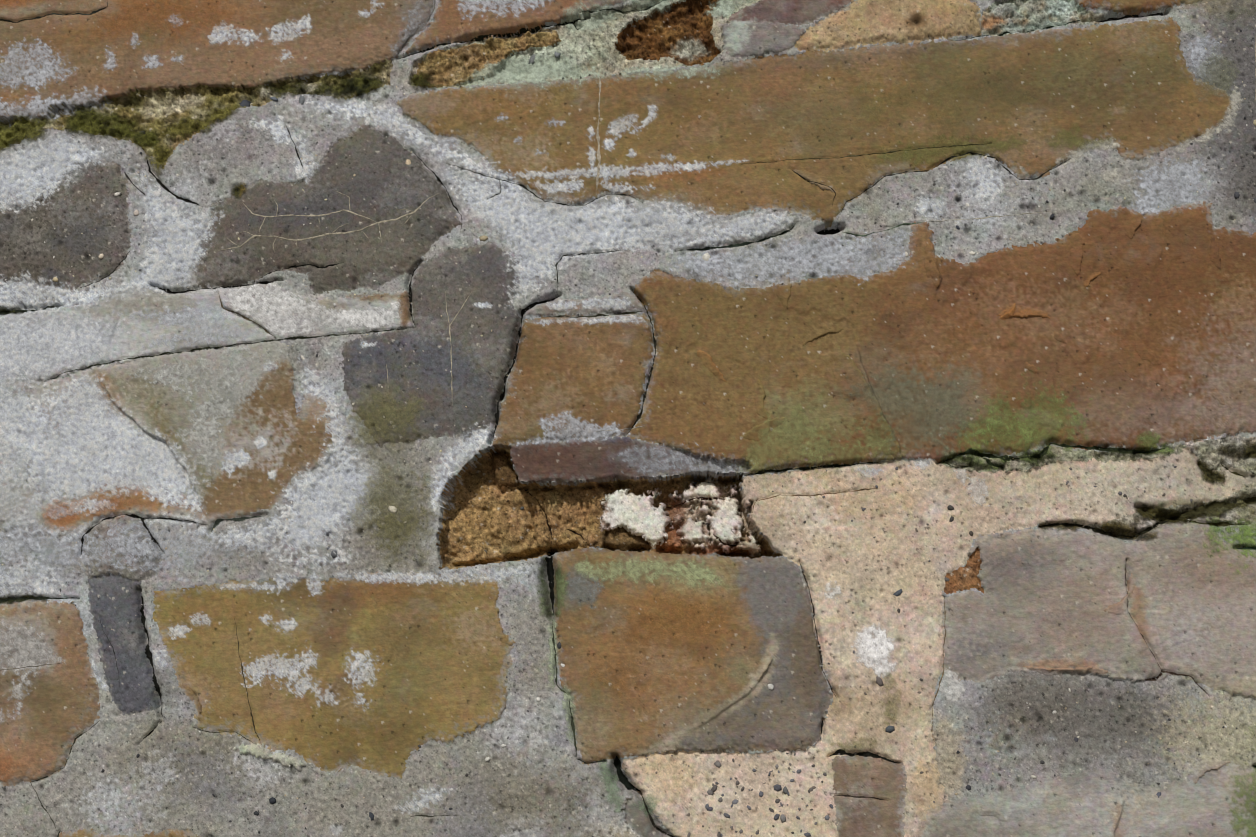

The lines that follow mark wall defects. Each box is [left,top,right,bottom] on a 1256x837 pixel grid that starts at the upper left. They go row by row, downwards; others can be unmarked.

leakage [250,115,318,180]
crack [46,75,643,396]
crack [1039,461,1256,696]
leakage [241,647,338,704]
leakage [344,651,373,704]